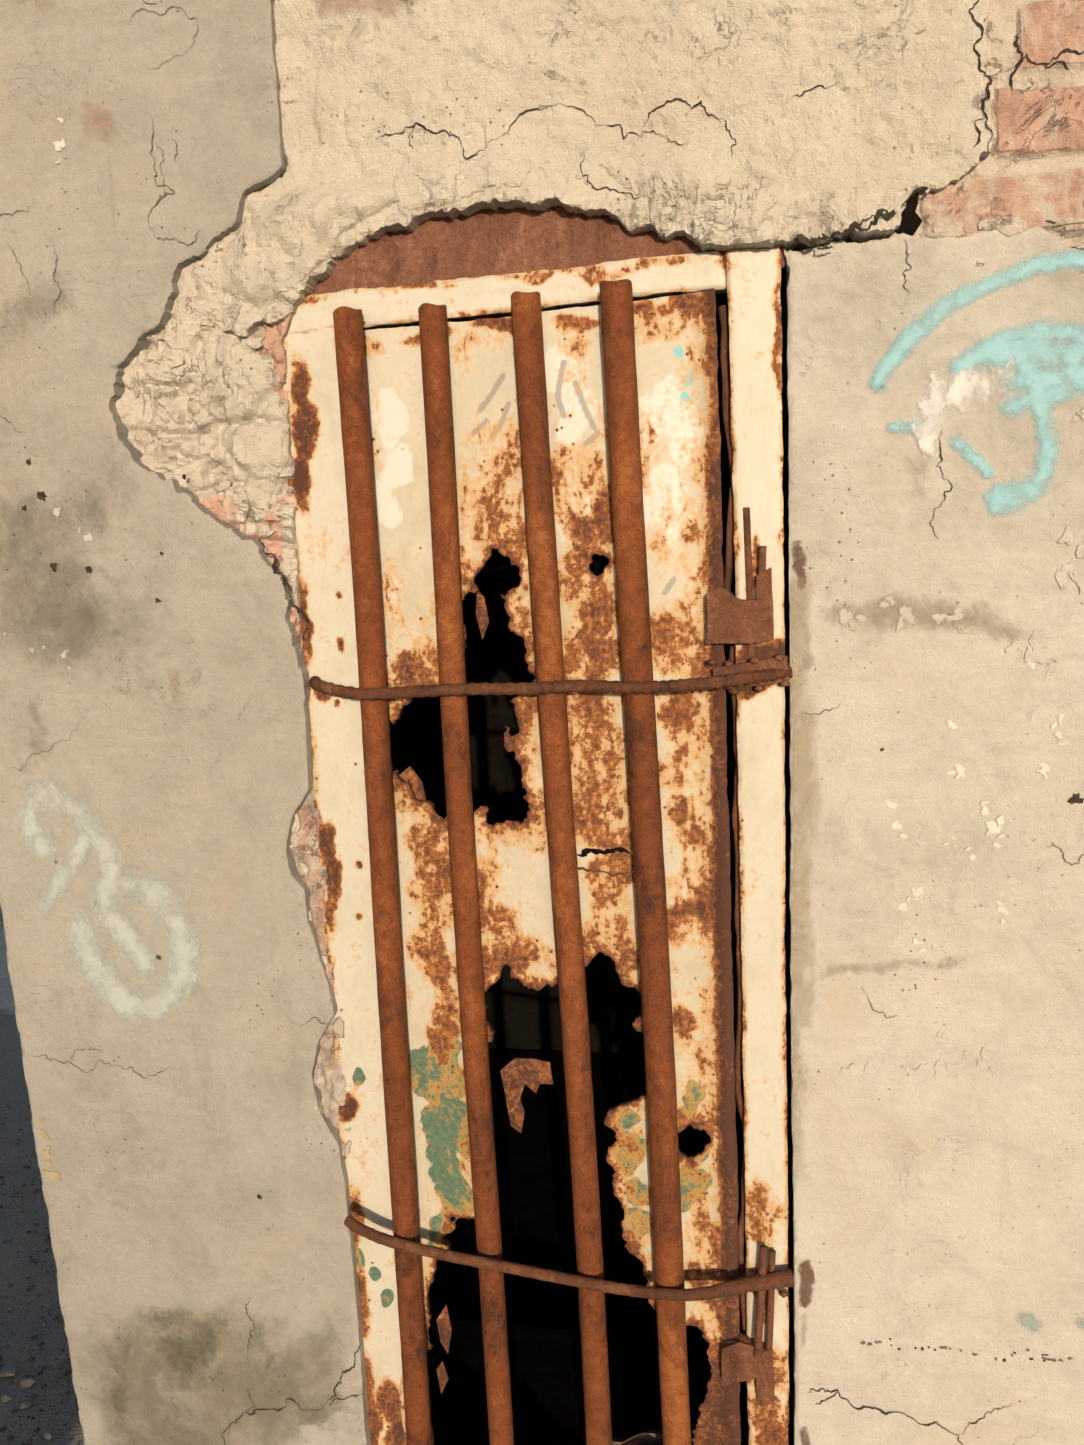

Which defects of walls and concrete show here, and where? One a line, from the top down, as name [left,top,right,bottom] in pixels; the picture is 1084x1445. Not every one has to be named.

crack [148,114,199,246]
crack [376,98,736,199]
crack [794,82,838,97]
spalling [889,0,1084,277]
crack [793,208,912,296]
spalling [116,240,304,652]
spalling [290,789,335,984]
spalling [314,1008,352,1156]
rust [798,1261,815,1308]
crack [222,1339,362,1445]
water stain [298,1410,364,1445]
crack [810,1388,1011,1445]